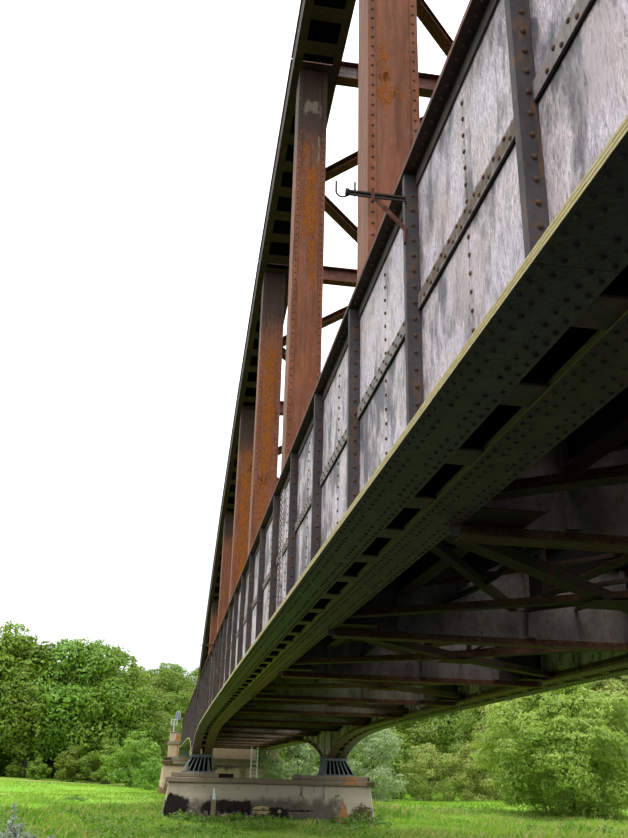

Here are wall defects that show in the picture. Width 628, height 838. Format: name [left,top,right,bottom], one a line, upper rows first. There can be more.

rust [300,164,320,288]
rust [235,348,278,587]
leakage [156,782,337,822]